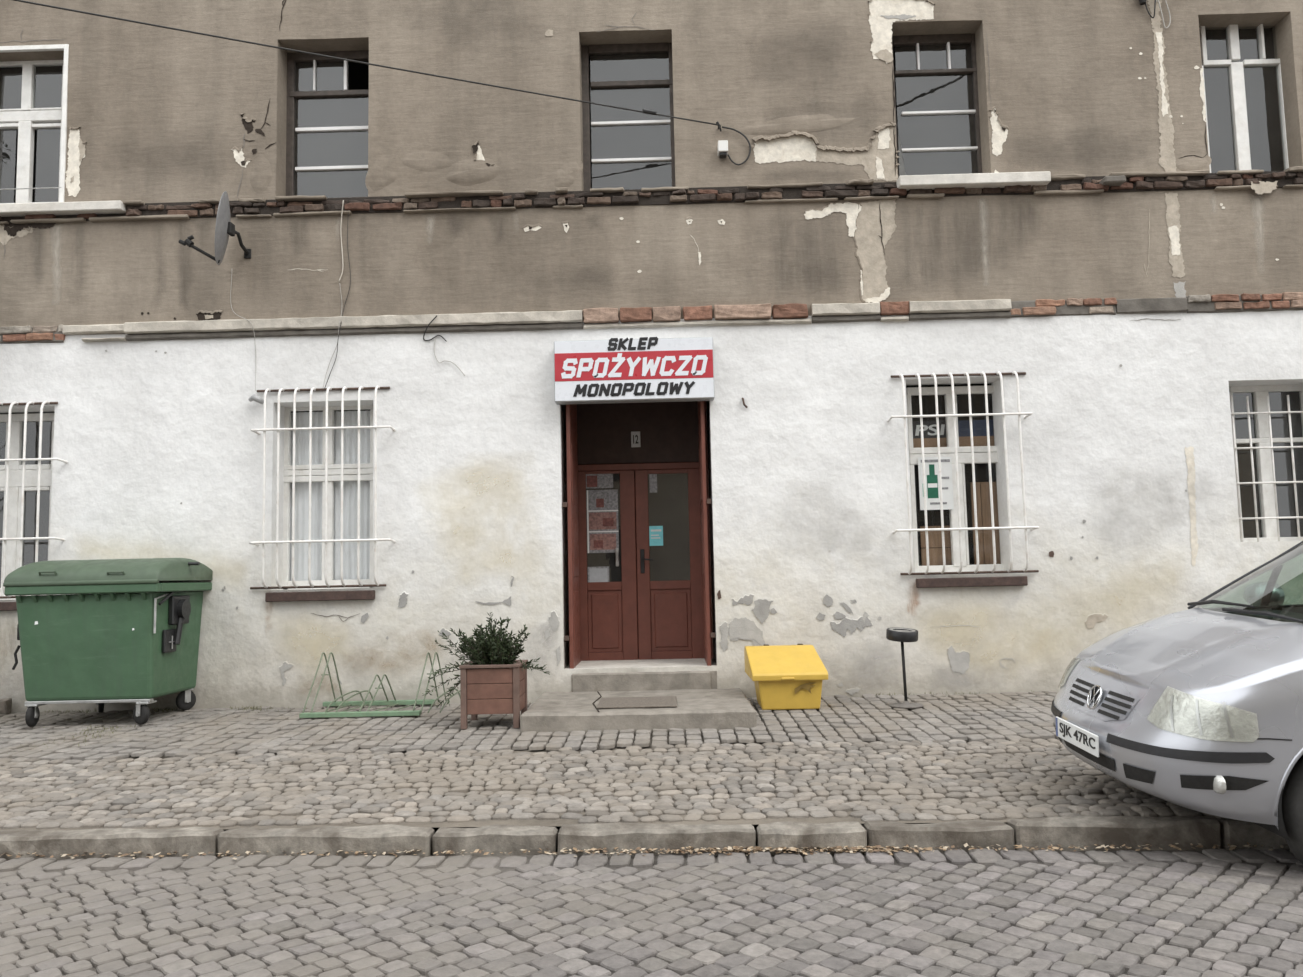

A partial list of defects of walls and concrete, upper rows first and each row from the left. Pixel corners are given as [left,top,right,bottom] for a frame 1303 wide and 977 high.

flaking render [867,0,935,64]
flaking render [65,127,86,197]
flaking render [231,113,265,168]
flaking render [472,141,495,166]
flaking render [751,122,901,181]
flaking render [989,106,1009,173]
flaking render [0,223,56,245]
flaking render [804,199,910,316]
peeling [1168,225,1181,256]
peeling [717,590,777,652]
peeling [816,594,882,637]